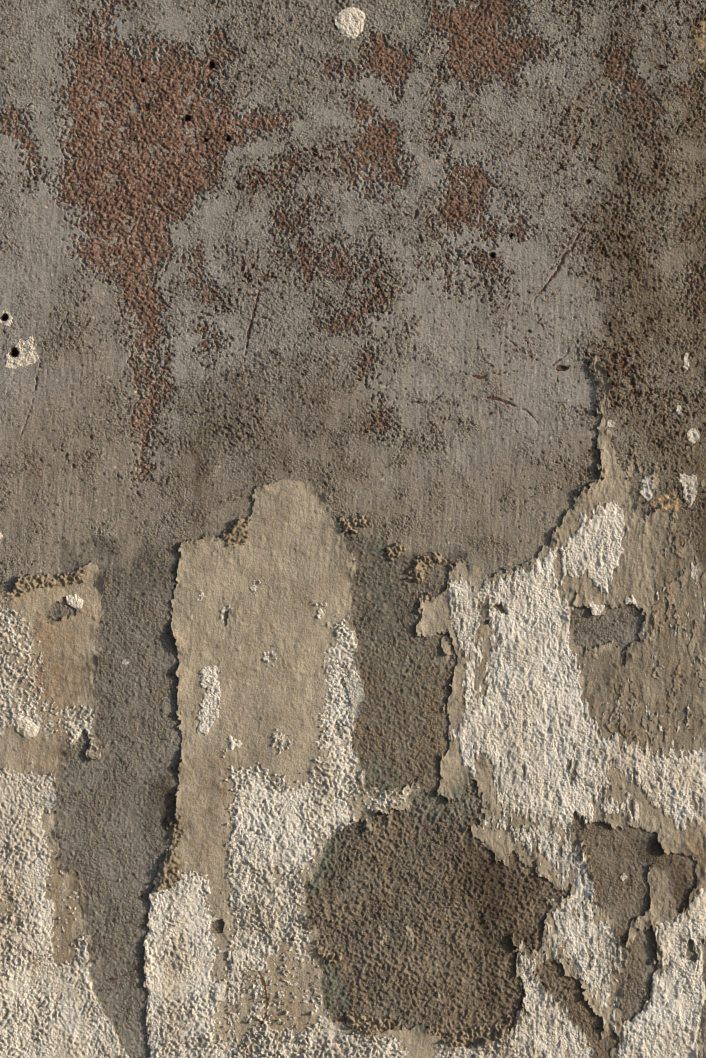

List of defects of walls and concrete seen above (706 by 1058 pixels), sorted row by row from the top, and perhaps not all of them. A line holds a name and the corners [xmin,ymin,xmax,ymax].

spalling [0,0,415,501]
spalling [318,0,706,372]
peeling [0,355,706,1058]